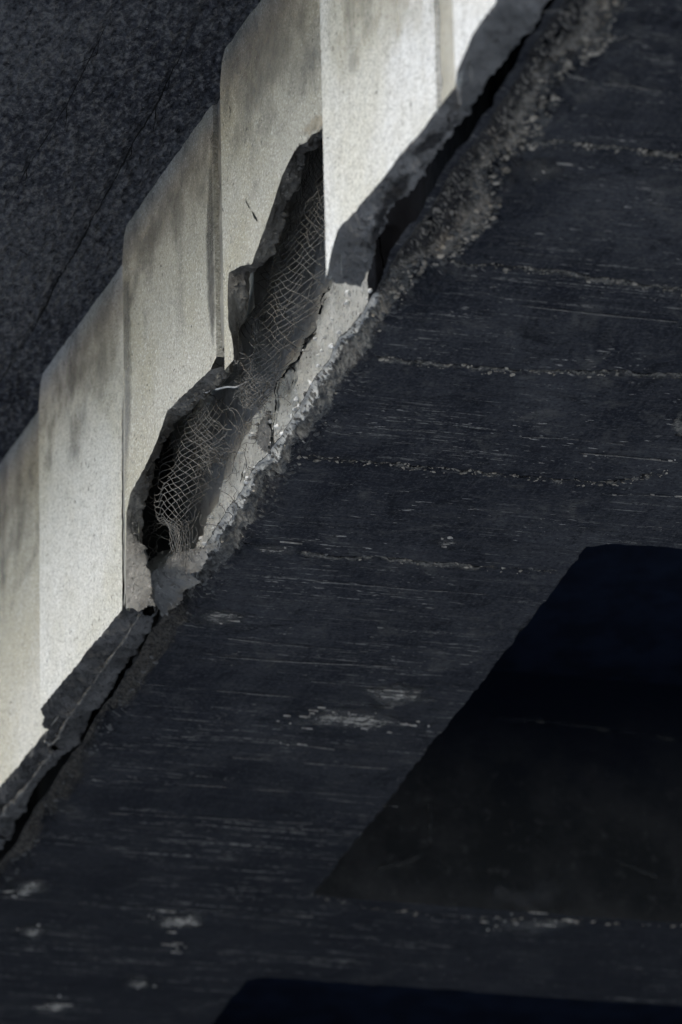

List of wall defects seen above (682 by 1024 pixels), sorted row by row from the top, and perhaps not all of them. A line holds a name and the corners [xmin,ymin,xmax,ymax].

crack [0,614,141,817]
spalling [0,0,627,882]